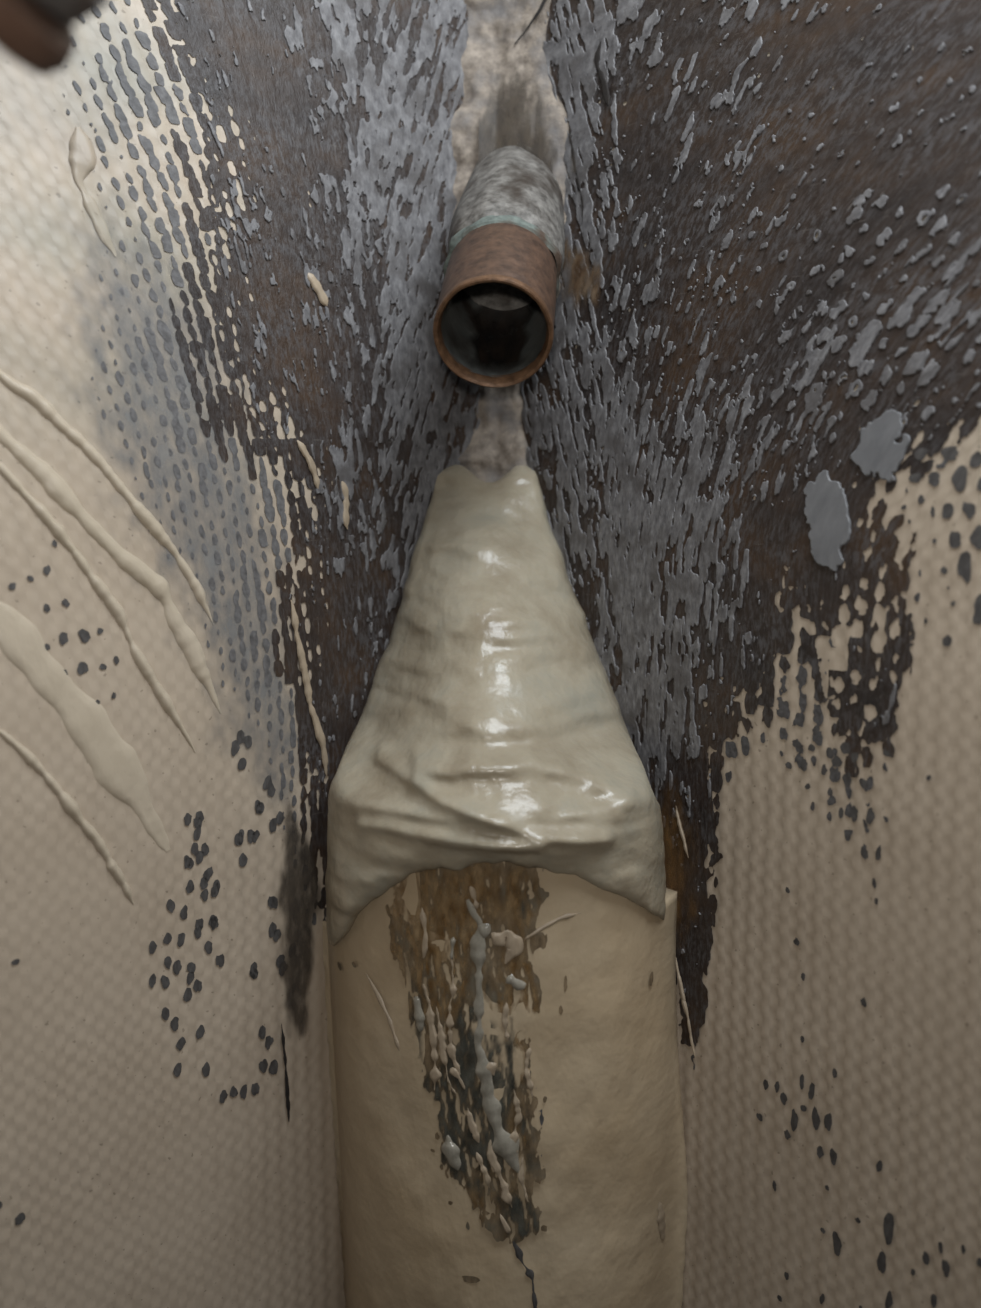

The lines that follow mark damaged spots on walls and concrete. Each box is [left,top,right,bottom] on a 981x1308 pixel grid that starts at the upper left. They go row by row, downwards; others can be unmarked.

leakage [478,76,557,175]
leakage [113,285,290,749]
leakage [279,811,318,1034]
peeling [386,861,549,1244]